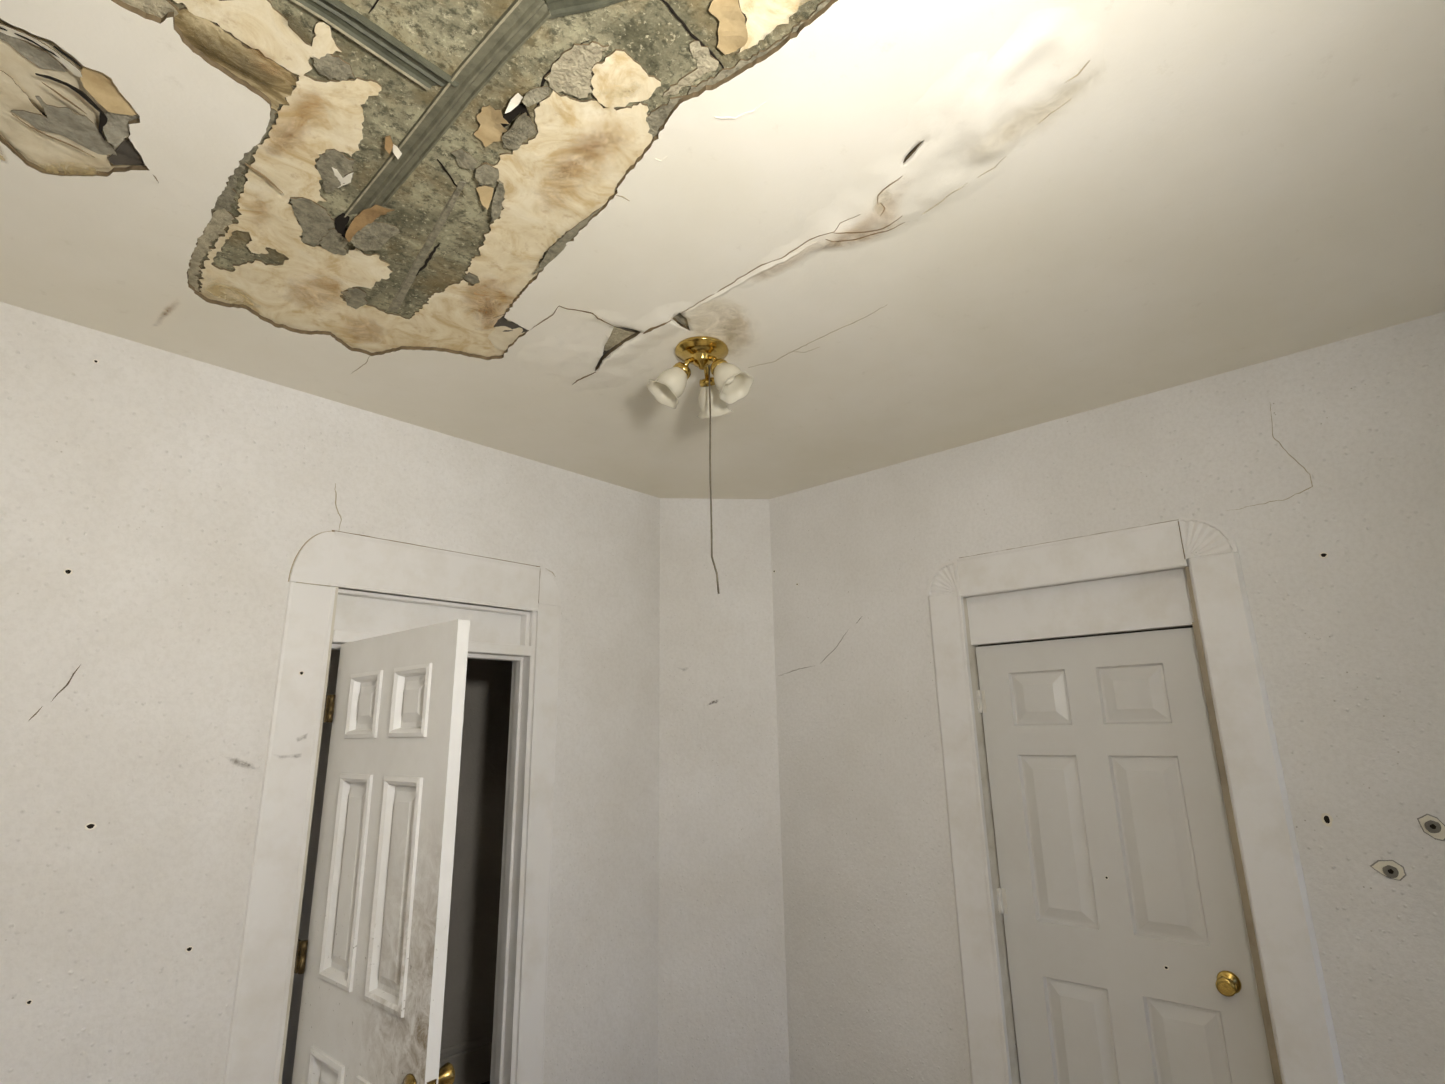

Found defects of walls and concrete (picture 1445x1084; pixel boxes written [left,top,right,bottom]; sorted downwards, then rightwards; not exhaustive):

spalling [474,41,609,150]
crack [537,40,589,106]
peeling [646,0,831,137]
crack [1038,60,1090,124]
peeling [385,135,402,159]
spalling [188,108,278,292]
spalling [290,149,400,255]
peeling [475,164,505,221]
crack [532,157,1005,334]
spalling [341,287,367,309]
spalling [595,326,638,368]
crack [748,306,885,368]